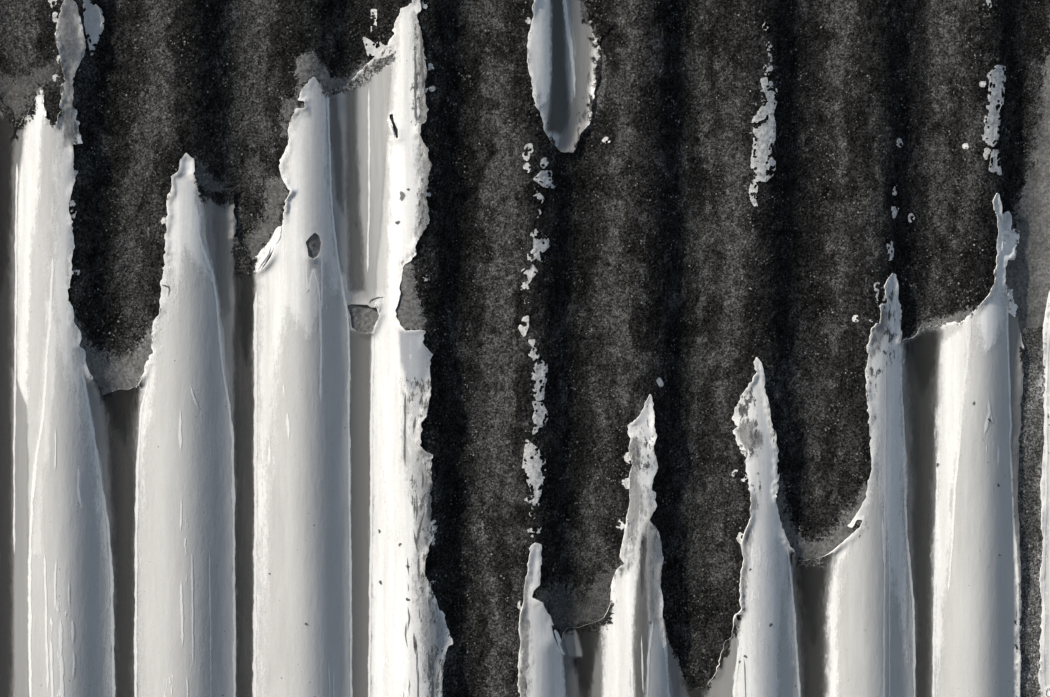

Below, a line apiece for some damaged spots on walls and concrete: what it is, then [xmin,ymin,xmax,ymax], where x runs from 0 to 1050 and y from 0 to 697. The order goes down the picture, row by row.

peeling [56,0,85,149]
peeling [400,12,432,234]
corrosion [0,0,412,697]
peeling [306,233,321,258]
peeling [347,304,379,333]
corrosion [395,0,1050,697]
peeling [736,377,762,463]
peeling [868,289,897,396]
peeling [403,377,444,697]
peeling [619,406,662,619]
peeling [741,473,761,611]
peeling [519,576,530,697]